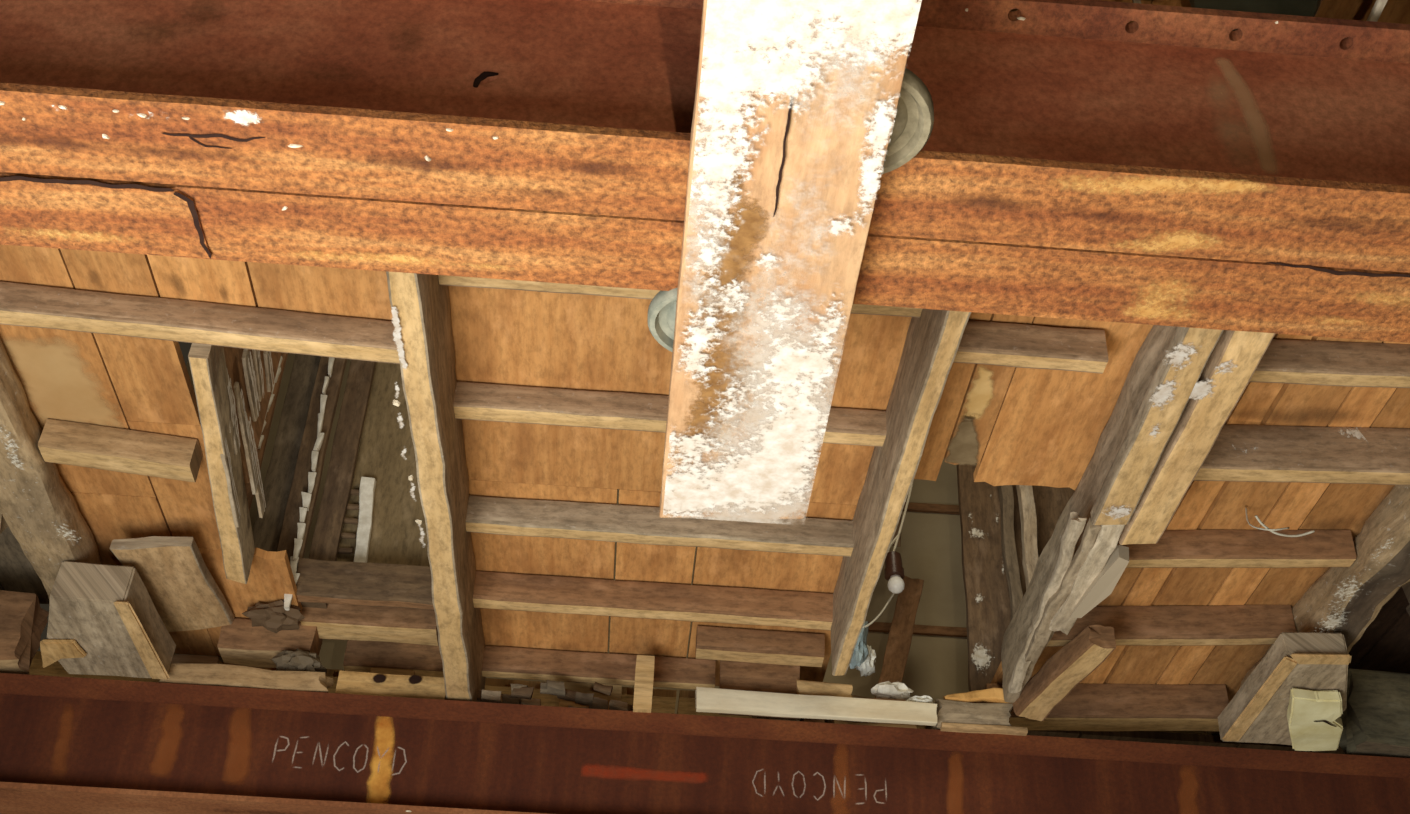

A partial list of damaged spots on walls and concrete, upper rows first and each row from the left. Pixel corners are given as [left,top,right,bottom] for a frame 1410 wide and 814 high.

crack [162,133,265,149]
crack [773,96,792,217]
corrosion [1078,179,1256,192]
crack [0,176,211,258]
corrosion [1143,234,1212,250]
crack [1266,262,1410,277]
leakage [686,171,768,439]
corrosion [1127,285,1176,317]
peeling [964,367,993,419]